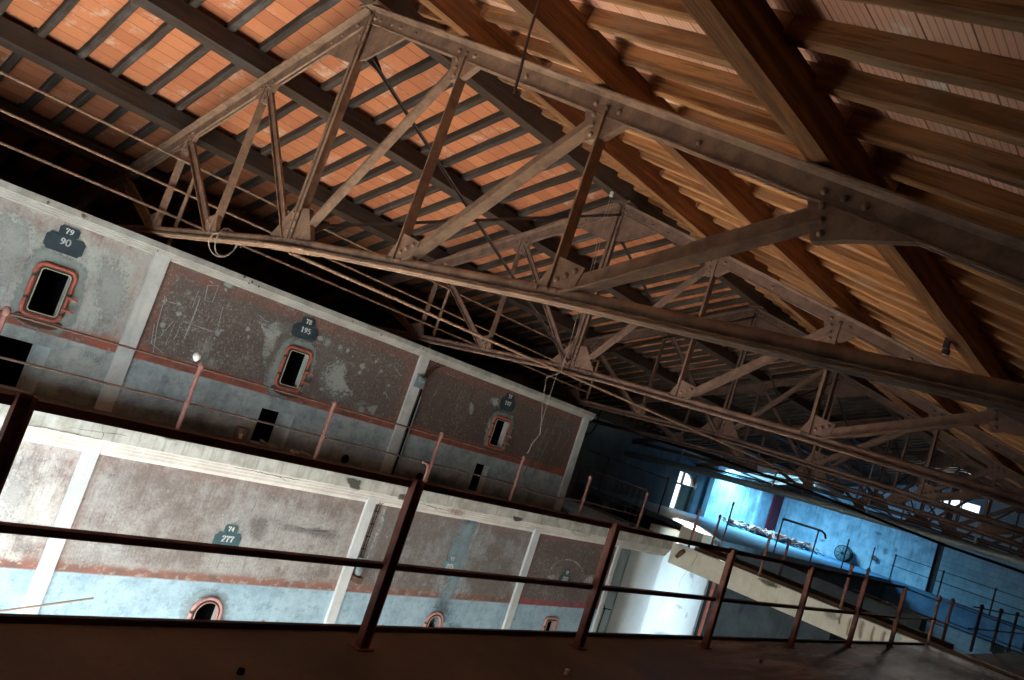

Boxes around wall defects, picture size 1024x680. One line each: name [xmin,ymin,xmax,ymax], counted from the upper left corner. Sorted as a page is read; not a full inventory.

peeling [317,336,383,401]
leakage [434,520,475,624]